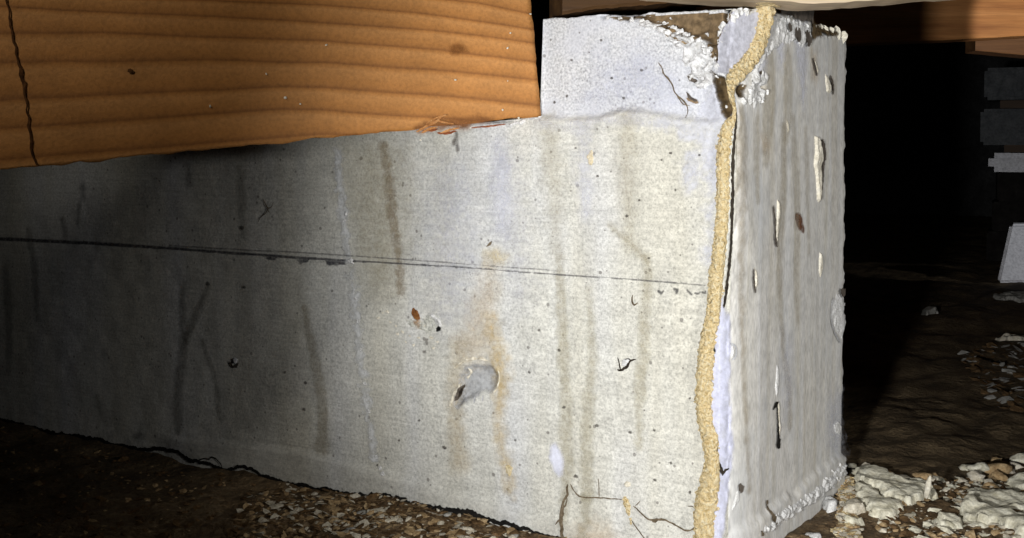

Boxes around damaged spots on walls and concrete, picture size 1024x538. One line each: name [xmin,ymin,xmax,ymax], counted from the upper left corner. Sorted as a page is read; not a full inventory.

spalling [605,8,759,104]
peeling [813,58,834,94]
spalling [812,18,848,43]
spalling [449,357,501,409]
crack [555,479,694,538]